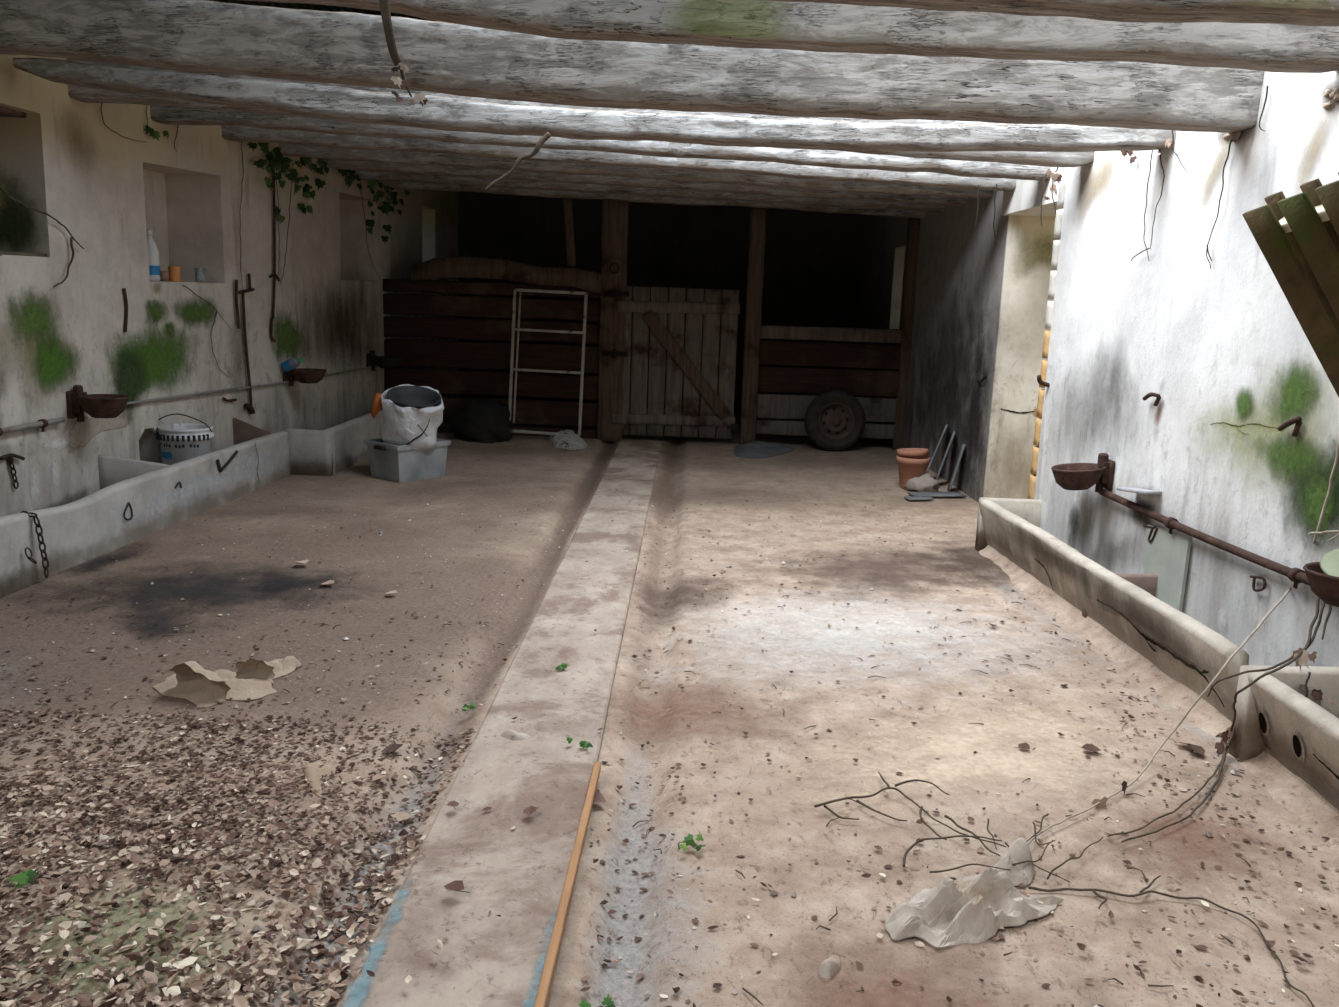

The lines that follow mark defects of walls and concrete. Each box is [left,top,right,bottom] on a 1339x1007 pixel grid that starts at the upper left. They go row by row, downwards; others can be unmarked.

damp [115,353,144,414]
crack [1097,599,1224,707]
crack [1313,753,1339,780]